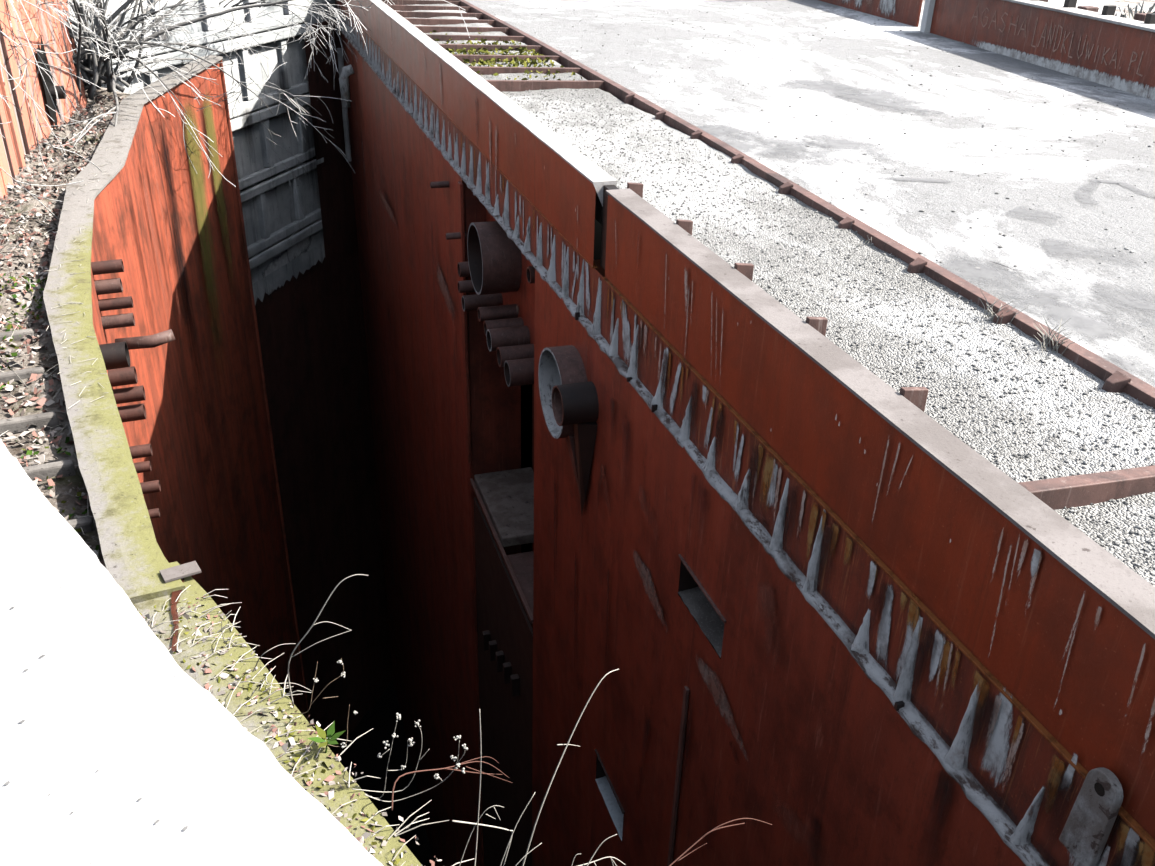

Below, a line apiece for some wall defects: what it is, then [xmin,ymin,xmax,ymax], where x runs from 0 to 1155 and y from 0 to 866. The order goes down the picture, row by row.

rust [607,289,688,397]
damp [872,437,913,521]
rust [797,490,852,563]
rust [171,578,184,651]
rust [867,561,877,596]
damp [876,585,960,693]
rust [929,630,952,681]
damp [989,527,1041,655]
damp [1055,591,1085,705]
damp [1125,644,1145,716]
damp [972,682,1018,825]
rust [1003,716,1024,781]